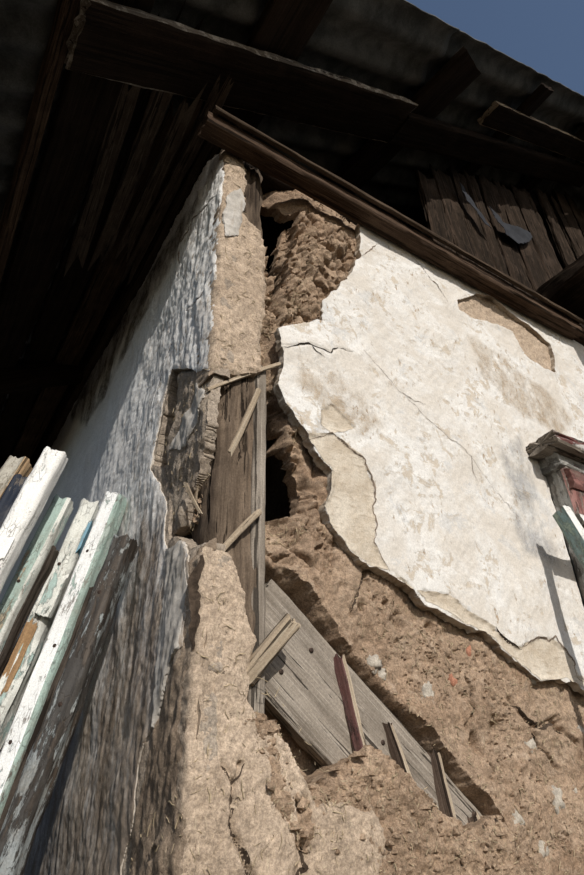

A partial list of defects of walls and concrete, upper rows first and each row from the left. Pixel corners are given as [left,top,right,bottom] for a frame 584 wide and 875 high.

flaking render [222,188,246,237]
leakage [71,211,193,423]
crack [284,342,519,517]
spalling [244,189,584,875]
spalling [128,369,224,875]
crack [221,763,250,875]
crack [295,846,309,875]